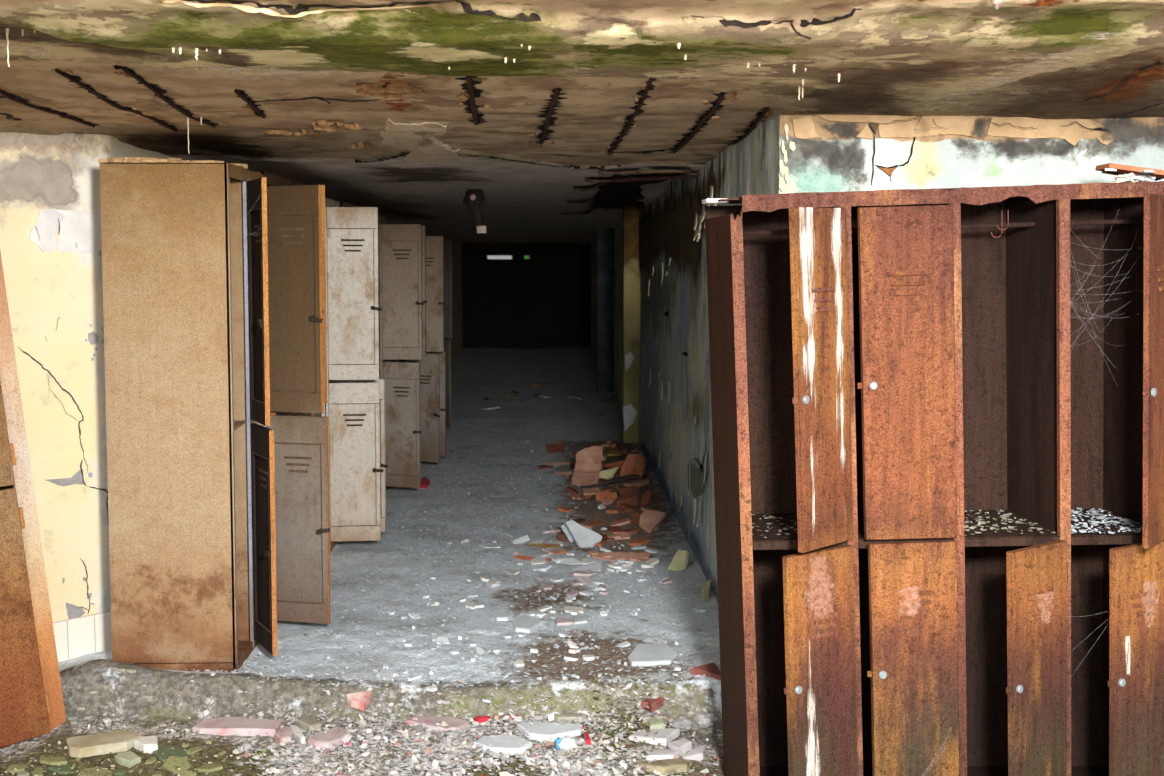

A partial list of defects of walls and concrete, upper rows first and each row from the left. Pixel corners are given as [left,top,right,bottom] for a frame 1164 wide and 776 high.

spalling [0,87,98,127]
spalling [52,65,226,132]